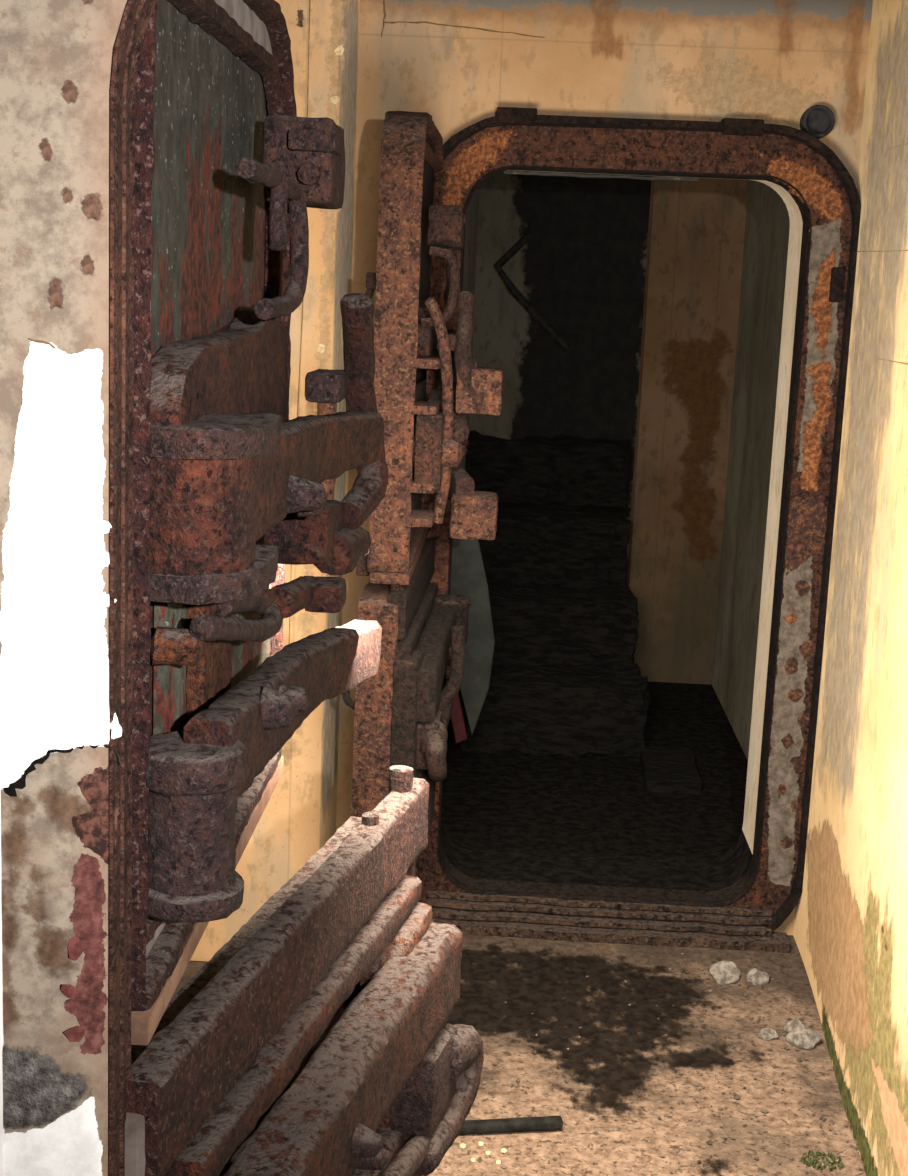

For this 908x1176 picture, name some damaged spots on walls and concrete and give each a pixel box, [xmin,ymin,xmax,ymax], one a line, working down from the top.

corrosion [443,130,517,205]
corrosion [753,152,845,227]
corrosion [664,330,732,560]
corrosion [785,249,836,597]
corrosion [788,688,804,702]
corrosion [784,640,815,675]
corrosion [781,715,810,774]
peeling [61,853,108,1054]
damp [447,944,734,1120]
damp [822,878,908,1176]
damp [698,1158,732,1174]